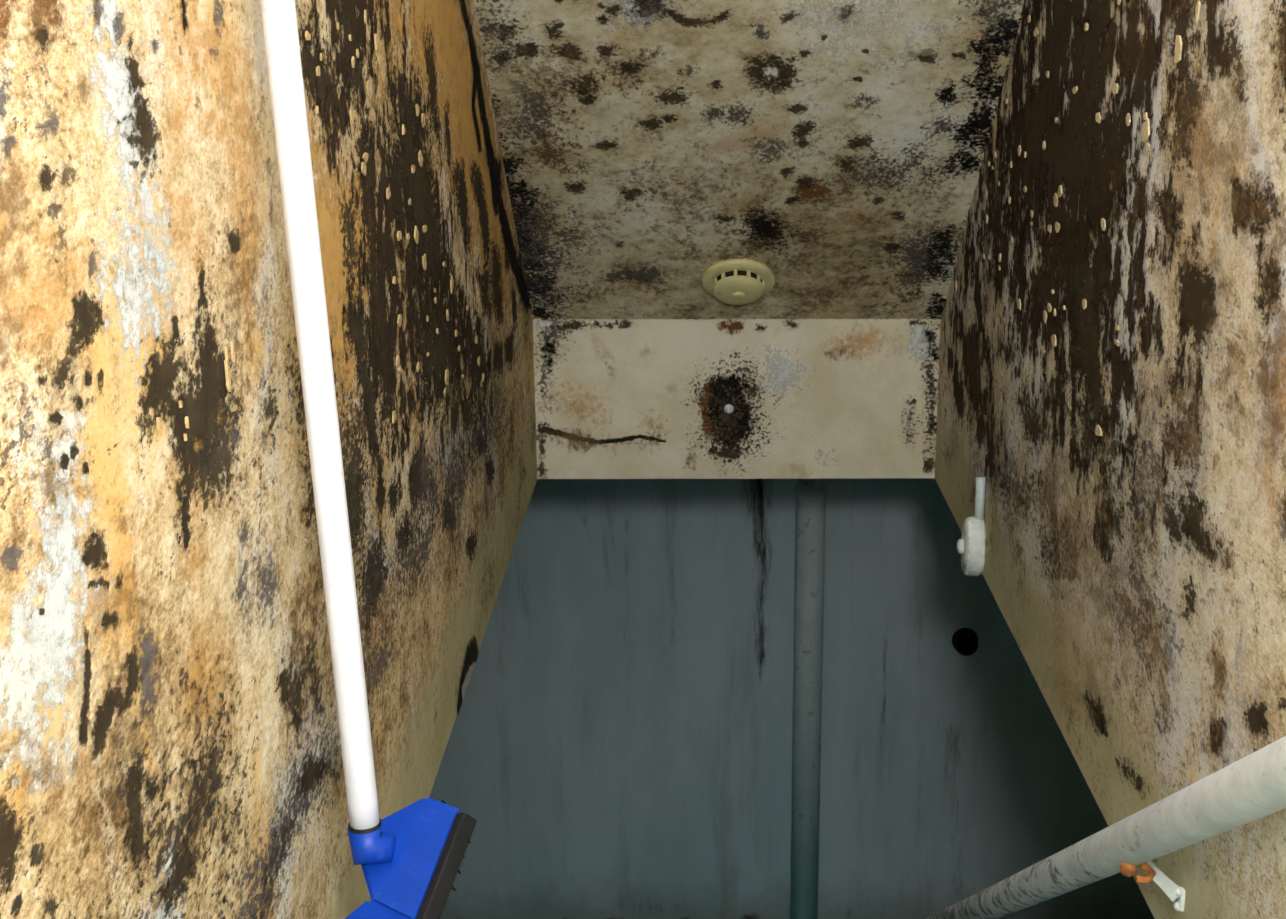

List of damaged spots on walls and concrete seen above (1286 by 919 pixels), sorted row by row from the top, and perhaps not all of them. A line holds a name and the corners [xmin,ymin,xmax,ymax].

damp [0,0,343,919]
crack [538,427,666,452]
damp [1115,755,1150,797]